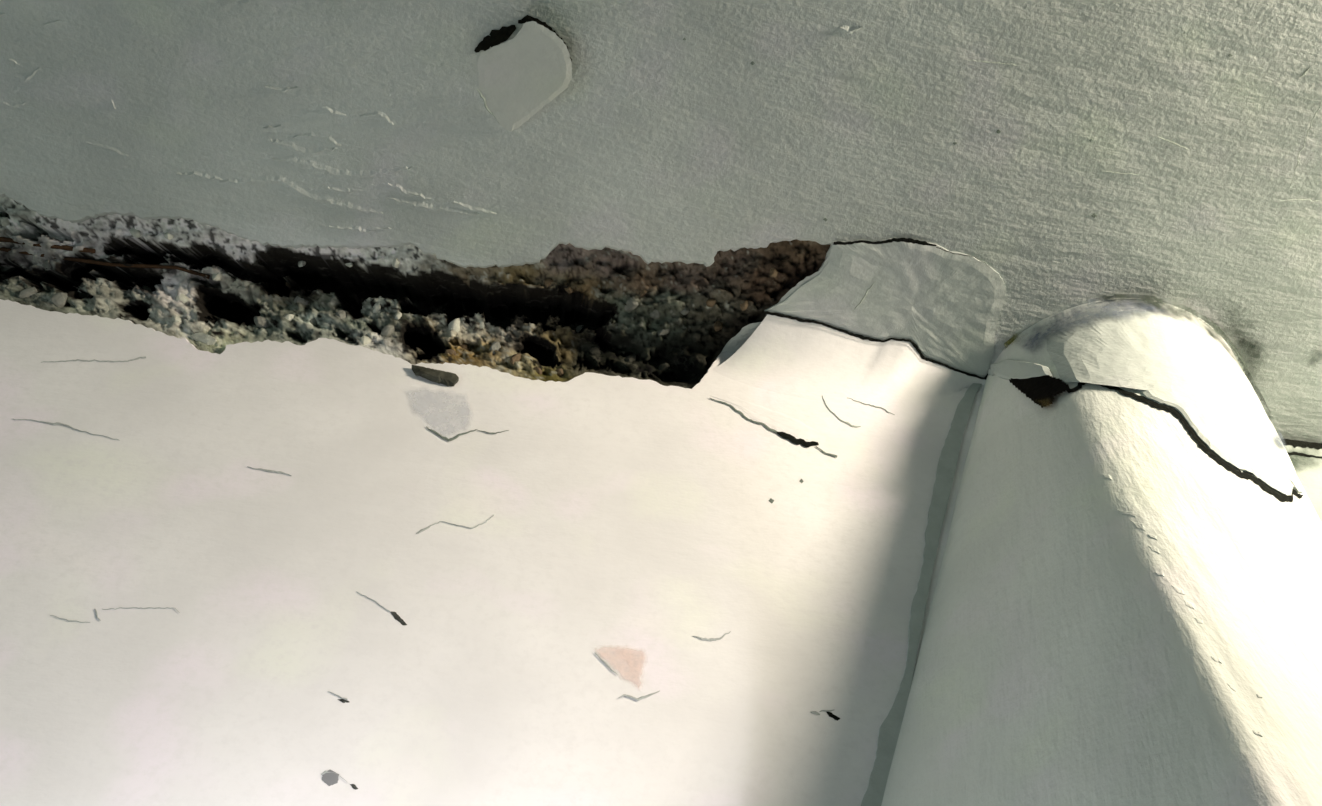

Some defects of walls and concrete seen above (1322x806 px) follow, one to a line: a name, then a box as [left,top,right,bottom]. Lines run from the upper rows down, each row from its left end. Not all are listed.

peeling [474,15,572,132]
crack [833,238,991,267]
spalling [0,196,831,389]
crack [765,311,988,380]
crack [709,395,894,457]
crack [1066,382,1304,502]
crack [1287,451,1322,459]